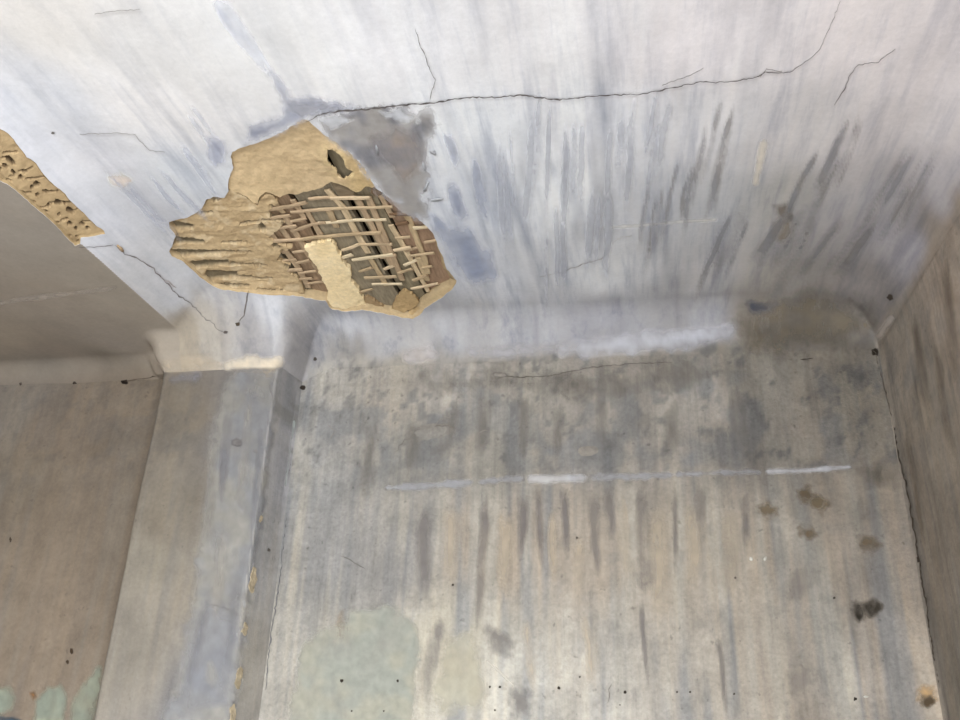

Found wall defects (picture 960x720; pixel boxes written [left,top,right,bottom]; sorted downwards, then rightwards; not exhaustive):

crack [307,5,839,122]
crack [834,50,894,105]
spalling [0,129,105,246]
crack [80,245,249,333]
spalling [169,105,457,319]
leakage [435,219,495,281]
leakage [758,131,844,255]
leakage [417,514,429,584]
leakage [477,507,489,613]
leakage [501,490,615,577]
leakage [852,599,883,622]
crack [870,348,939,683]